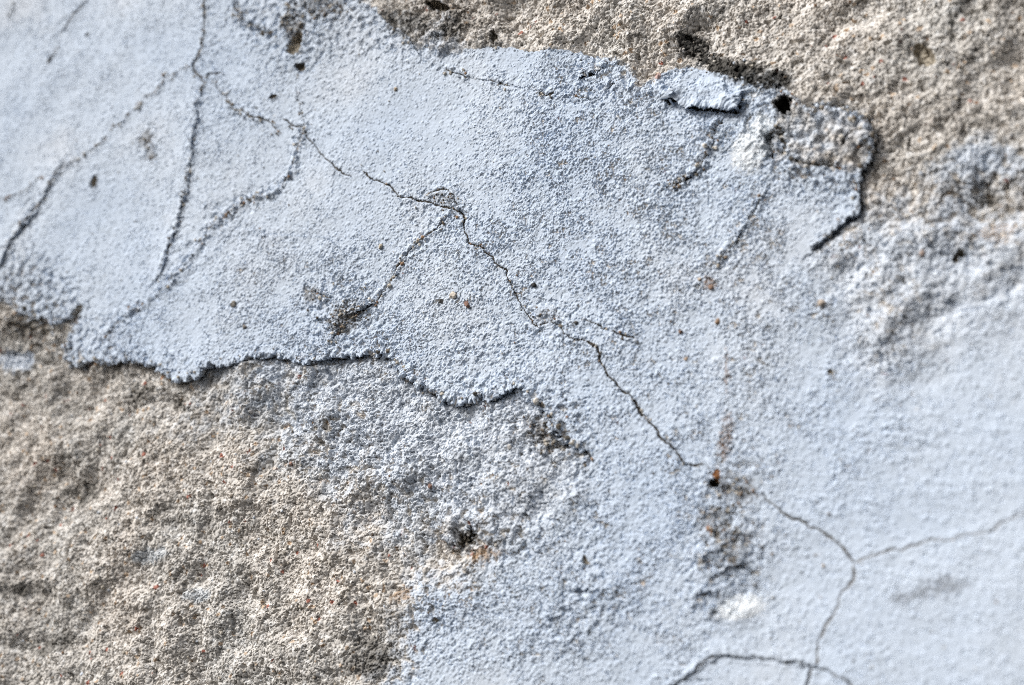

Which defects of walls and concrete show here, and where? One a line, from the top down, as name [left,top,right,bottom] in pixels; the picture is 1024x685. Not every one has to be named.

hole [286,30,306,73]
crack [0,0,713,477]
spalling [360,0,1024,383]
crack [661,98,745,190]
crack [716,192,767,268]
crack [773,122,868,172]
spalling [0,294,593,685]
crack [438,526,476,548]
crack [675,487,1024,685]
peeling [685,655,842,685]